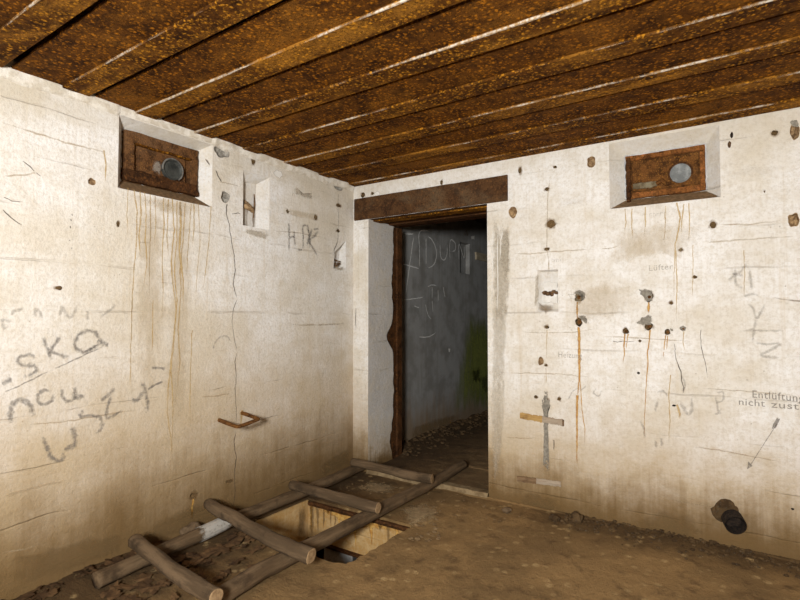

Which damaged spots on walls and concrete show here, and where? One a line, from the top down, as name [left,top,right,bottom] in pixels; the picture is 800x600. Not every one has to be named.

rust [119,181,211,405]
rust [613,191,717,276]
rust [576,303,585,458]